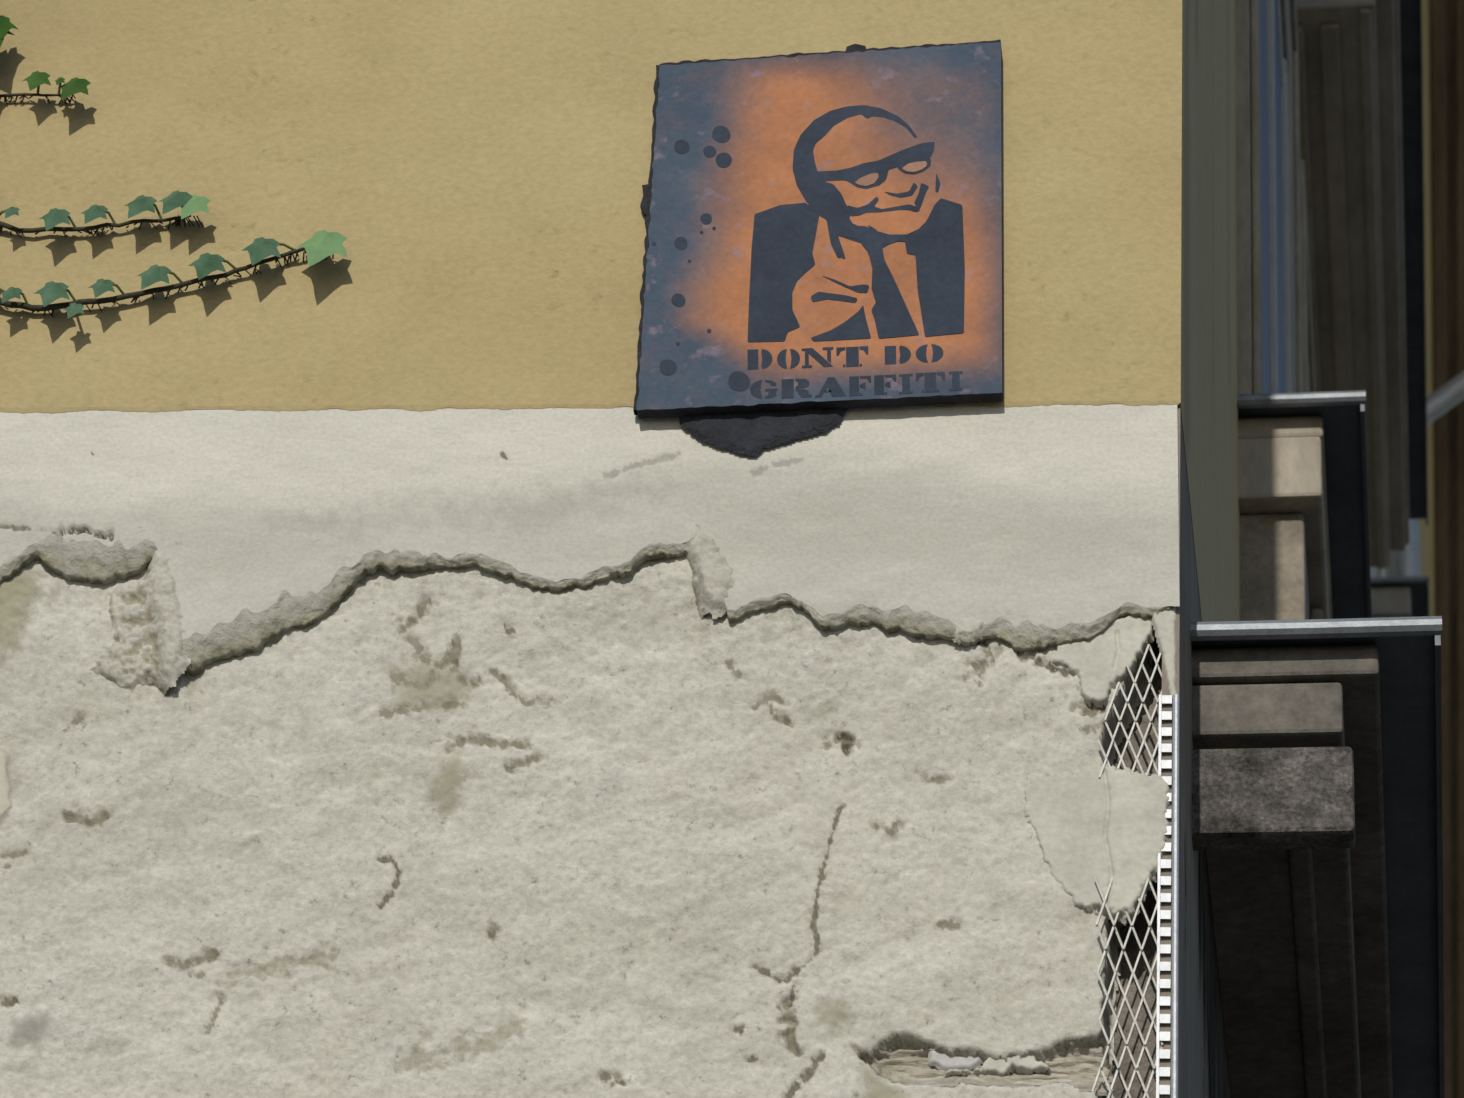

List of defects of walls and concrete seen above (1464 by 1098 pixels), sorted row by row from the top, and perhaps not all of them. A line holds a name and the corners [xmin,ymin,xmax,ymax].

spalling [0,523,1177,1098]
crack [753,806,843,1006]
crack [786,1052,825,1098]